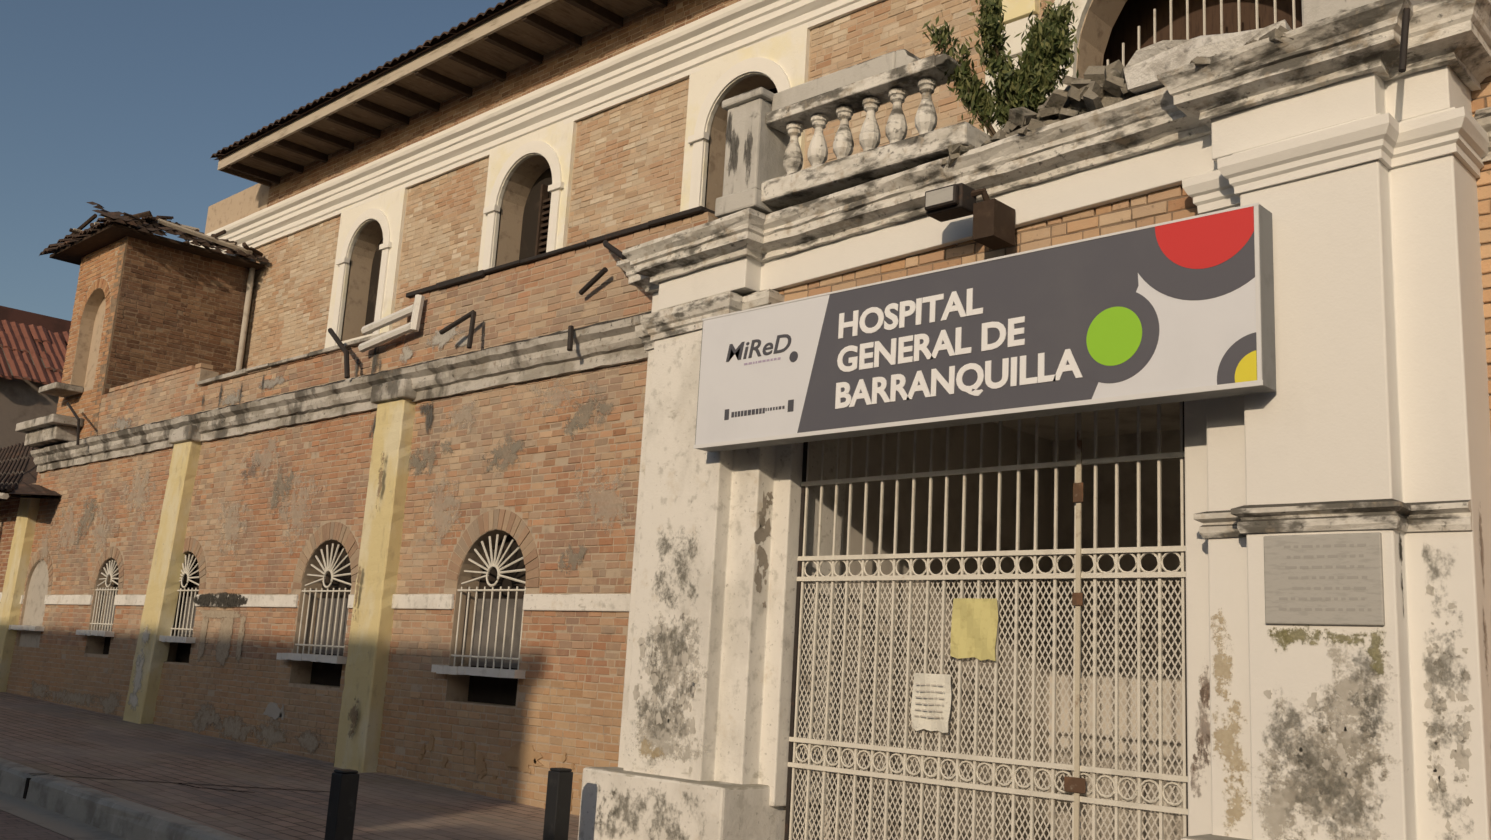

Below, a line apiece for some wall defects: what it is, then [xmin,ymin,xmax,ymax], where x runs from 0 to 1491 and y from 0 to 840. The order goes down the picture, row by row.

spalling [1063,68,1126,115]
damp [657,537,698,605]
damp [638,625,689,758]
damp [1211,613,1251,835]
damp [1272,709,1373,830]
damp [1352,654,1381,734]
mould [1424,648,1465,749]